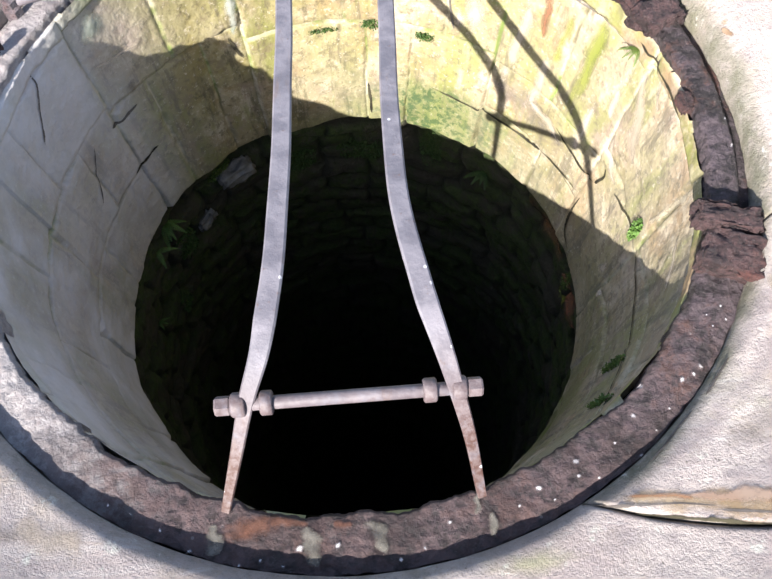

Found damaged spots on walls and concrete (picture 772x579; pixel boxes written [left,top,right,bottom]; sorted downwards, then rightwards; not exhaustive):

corrosion [542,0,553,36]
damp [571,25,606,98]
crack [365,83,373,112]
crack [437,90,606,247]
crack [615,196,631,227]